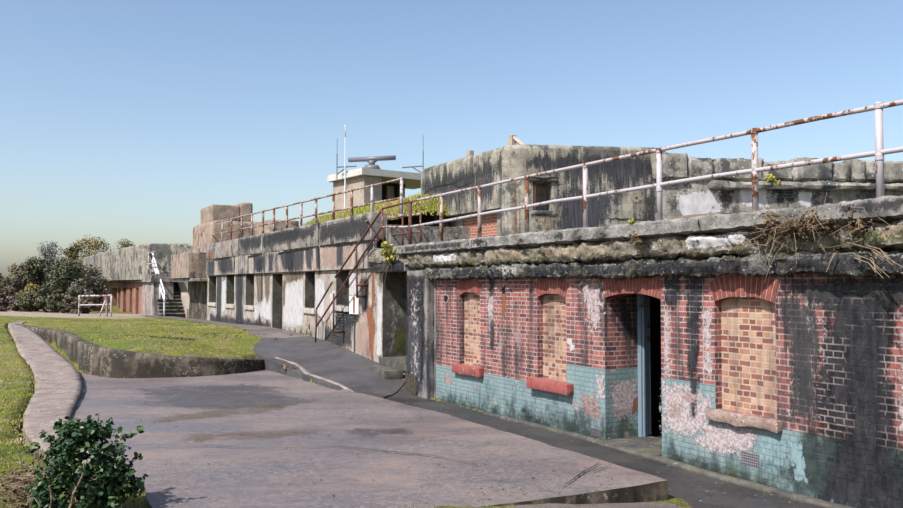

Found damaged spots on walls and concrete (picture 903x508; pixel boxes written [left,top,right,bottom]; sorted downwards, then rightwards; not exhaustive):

leakage [422,152,502,210]
leakage [520,148,657,231]
leakage [208,258,271,327]
leakage [239,216,424,391]
rust [353,271,375,357]
leakage [452,262,638,352]
leakage [638,258,750,417]
leakage [777,252,903,508]
peeling [659,379,808,484]